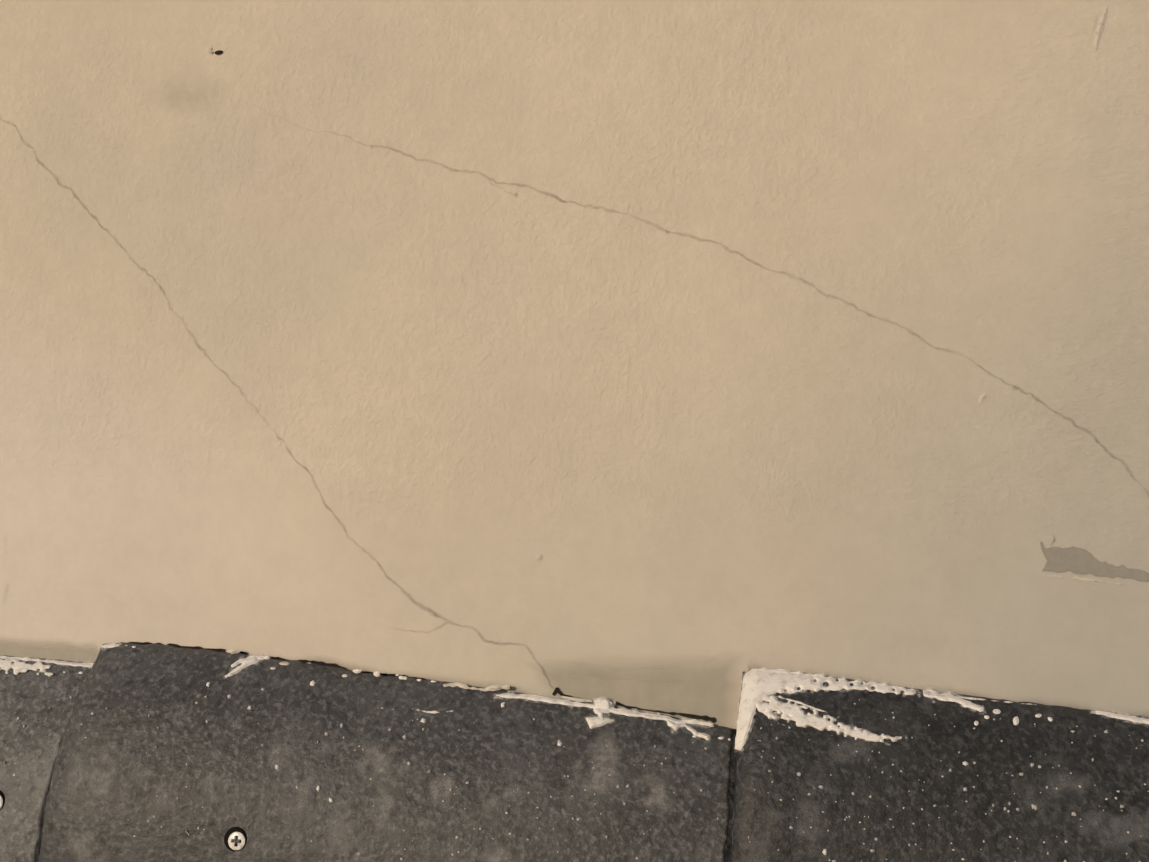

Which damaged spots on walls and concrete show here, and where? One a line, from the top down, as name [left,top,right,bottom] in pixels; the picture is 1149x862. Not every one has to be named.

peeling [1041,539,1149,585]